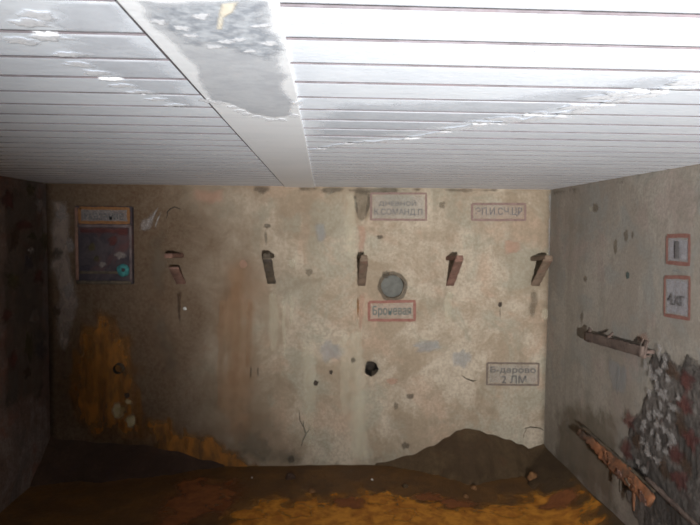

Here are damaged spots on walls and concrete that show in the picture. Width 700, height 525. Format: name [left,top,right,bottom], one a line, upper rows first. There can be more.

peeling [144,0,303,122]
corrosion [68,316,257,466]
spalling [618,345,700,525]